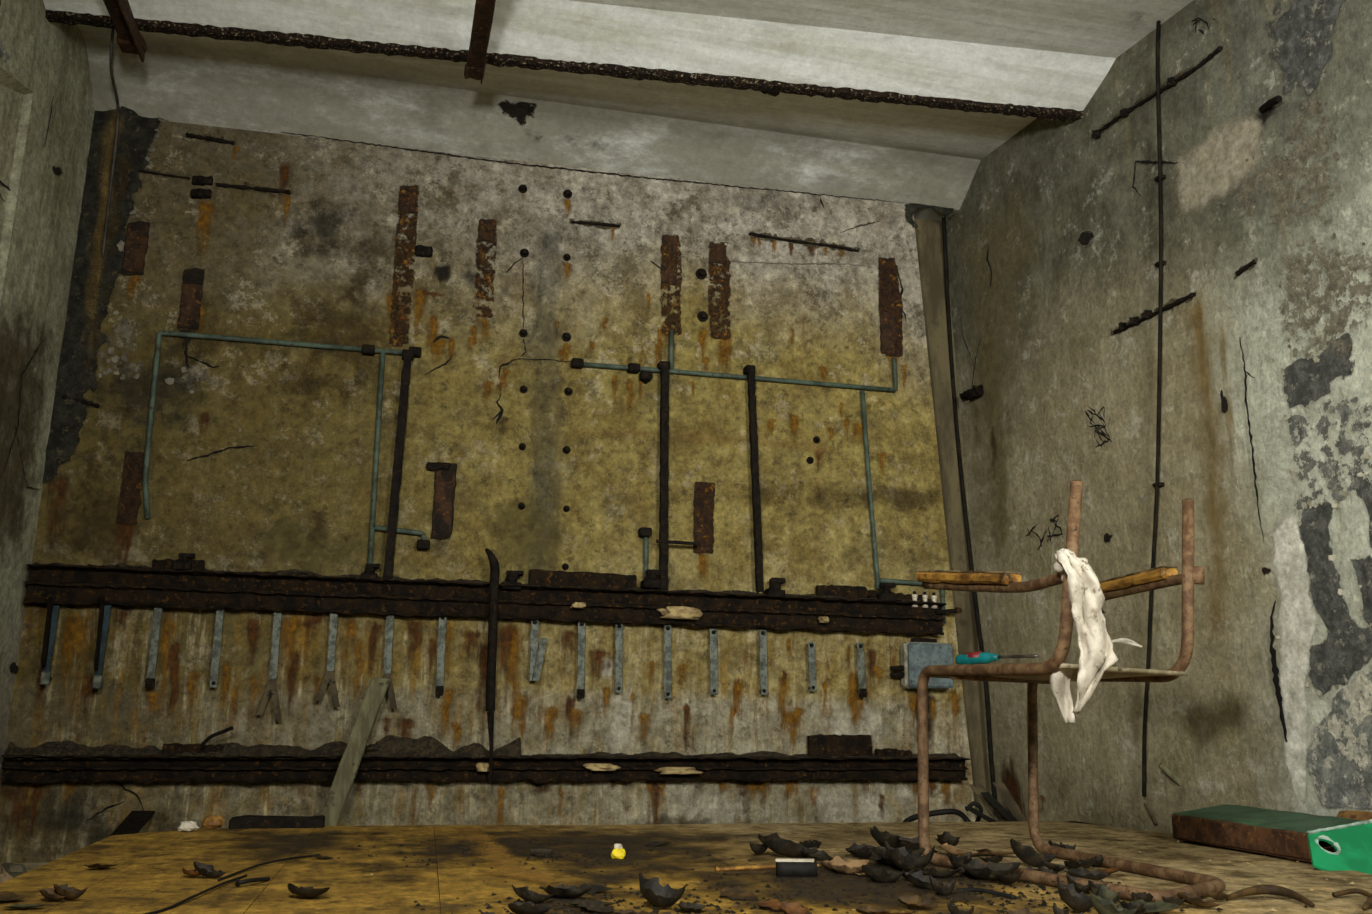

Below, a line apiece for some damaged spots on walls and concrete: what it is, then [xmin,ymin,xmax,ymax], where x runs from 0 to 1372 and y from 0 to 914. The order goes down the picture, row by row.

spalling [42,106,190,484]
peeling [1223,0,1372,813]
corrosion [148,618,199,711]
corrosion [282,614,323,704]
corrosion [383,717,413,738]
corrosion [408,621,528,743]
corrosion [544,697,581,735]
corrosion [590,650,610,708]
corrosion [730,678,744,731]
corrosion [778,671,804,743]
corrosion [847,649,883,721]
corrosion [910,691,959,739]